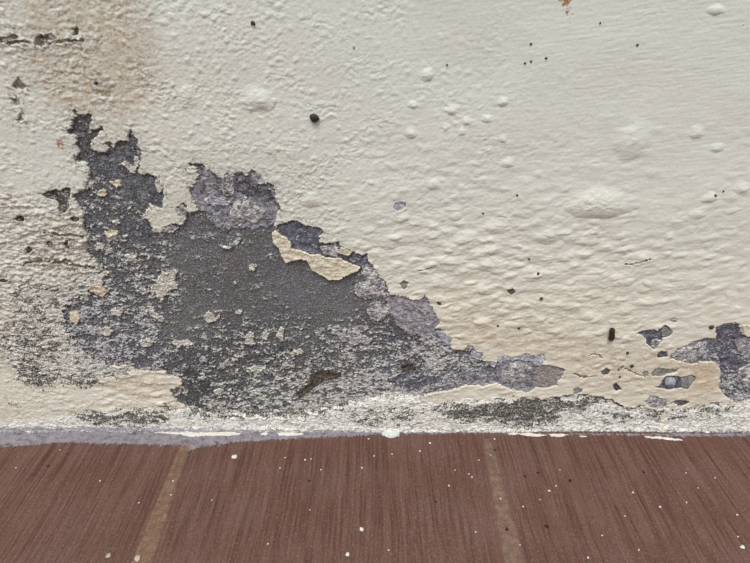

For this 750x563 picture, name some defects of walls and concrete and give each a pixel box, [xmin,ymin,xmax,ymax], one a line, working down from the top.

peeling [0,110,750,433]
water stain [9,292,101,391]
water stain [74,398,179,429]
water stain [187,394,741,430]